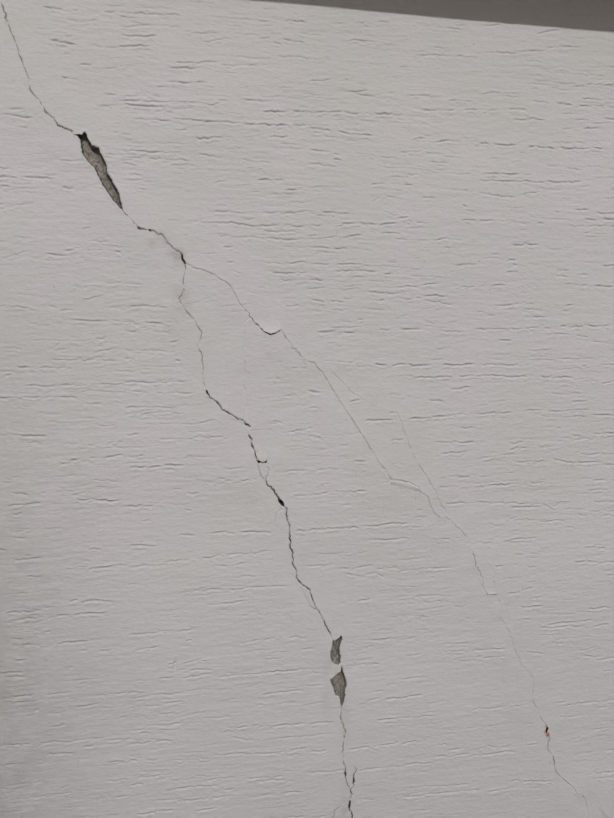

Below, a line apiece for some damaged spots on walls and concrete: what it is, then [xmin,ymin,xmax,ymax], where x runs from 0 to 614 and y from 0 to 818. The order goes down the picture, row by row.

crack [1,4,73,132]
flaking render [73,131,123,211]
crack [123,211,329,632]
flaking render [329,633,349,706]
crack [332,707,357,818]